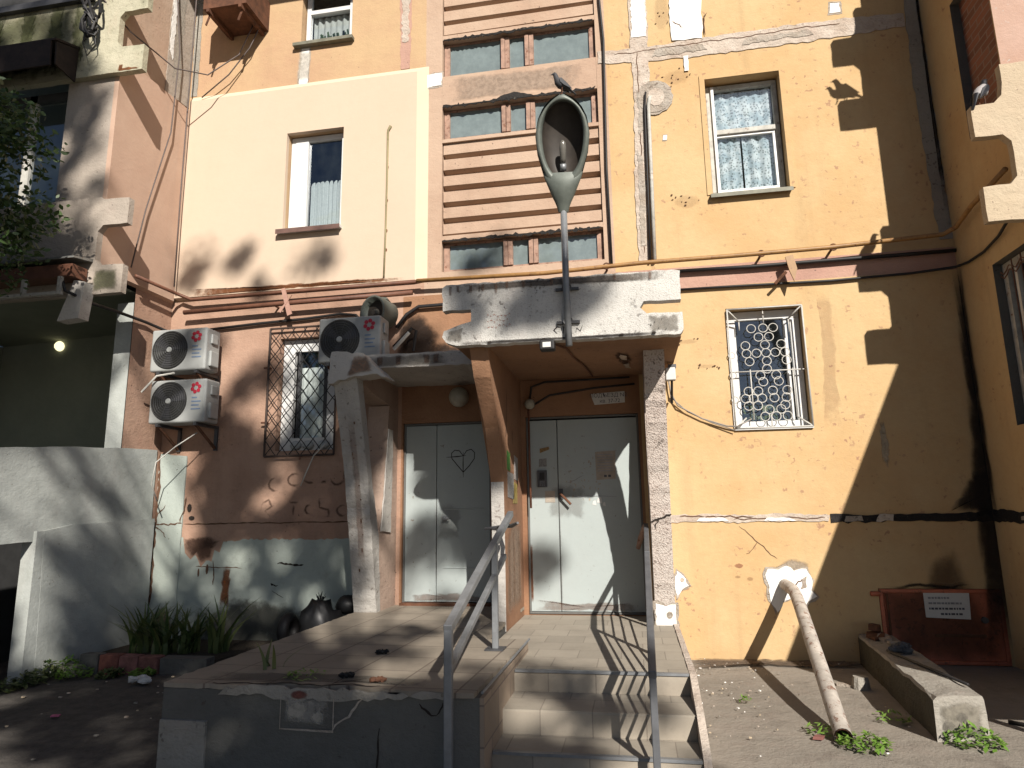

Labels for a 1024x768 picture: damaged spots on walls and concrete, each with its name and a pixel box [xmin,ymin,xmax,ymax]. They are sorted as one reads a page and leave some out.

peeling [186,538,216,576]
crack [147,454,348,612]
crack [651,514,825,558]
damp [895,283,1008,652]